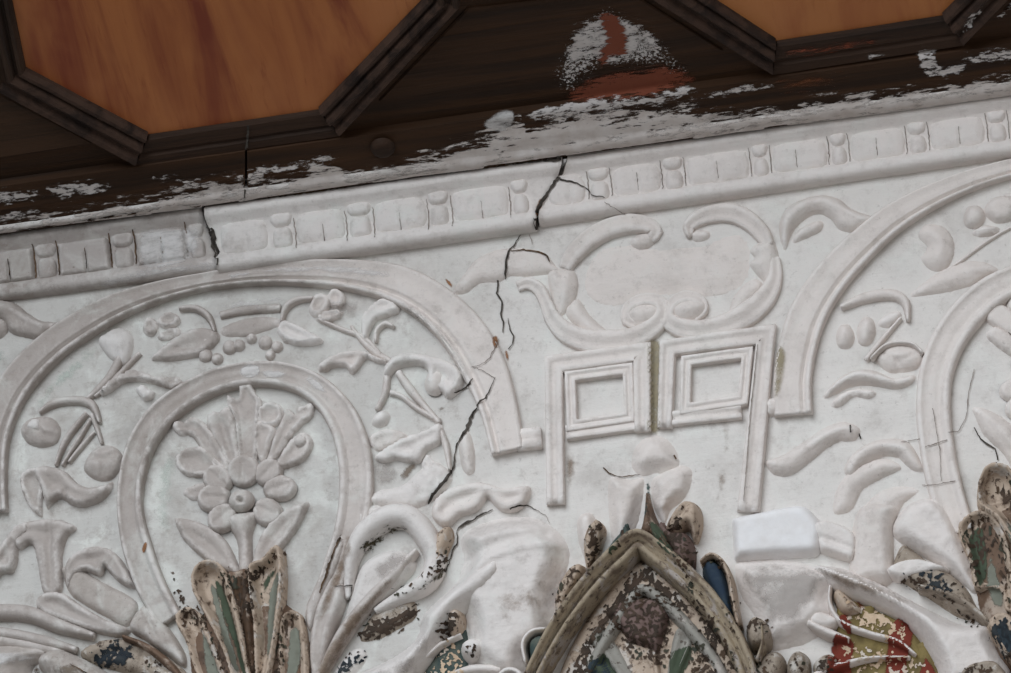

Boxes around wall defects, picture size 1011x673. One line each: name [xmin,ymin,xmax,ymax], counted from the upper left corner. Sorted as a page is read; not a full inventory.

crack [242,125,250,198]
crack [194,206,218,265]
crack [420,156,625,504]
peeling [91,639,165,673]
peeling [171,572,228,673]
peeling [218,551,287,673]
peeling [337,603,420,673]
peeling [425,612,476,673]
peeling [552,523,626,621]
peeling [566,506,773,673]
peeling [817,596,929,673]
peeling [901,570,978,627]